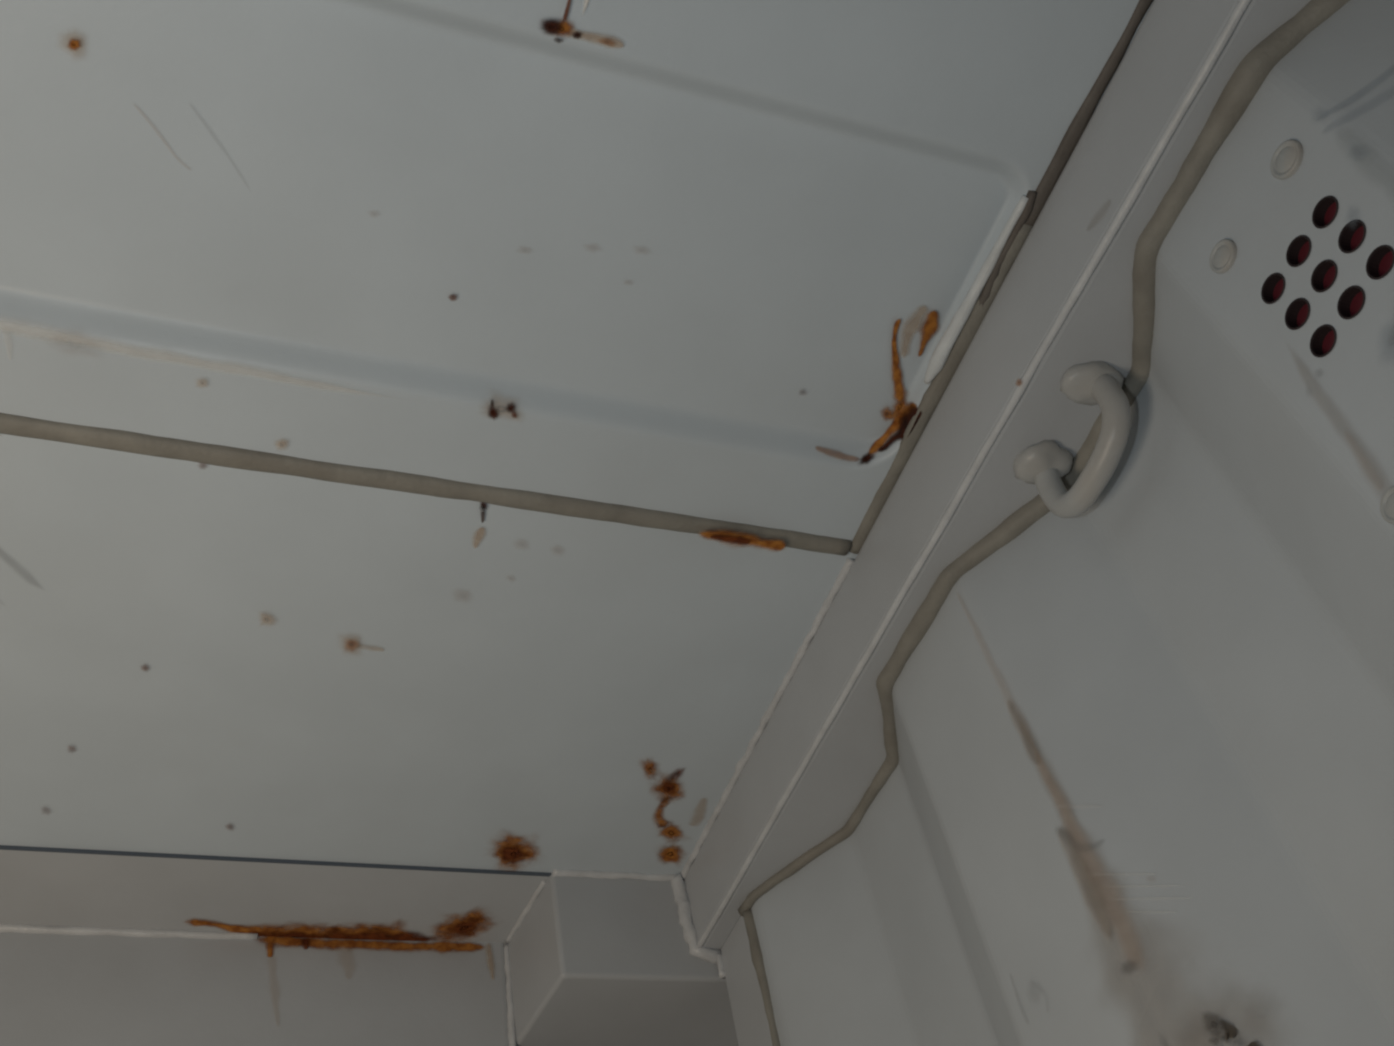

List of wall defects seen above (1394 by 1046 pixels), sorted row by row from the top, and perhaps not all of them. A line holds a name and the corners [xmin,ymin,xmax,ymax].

corrosion [700,531,785,551]
corrosion [644,762,682,862]
corrosion [495,836,536,867]
corrosion [188,911,487,957]